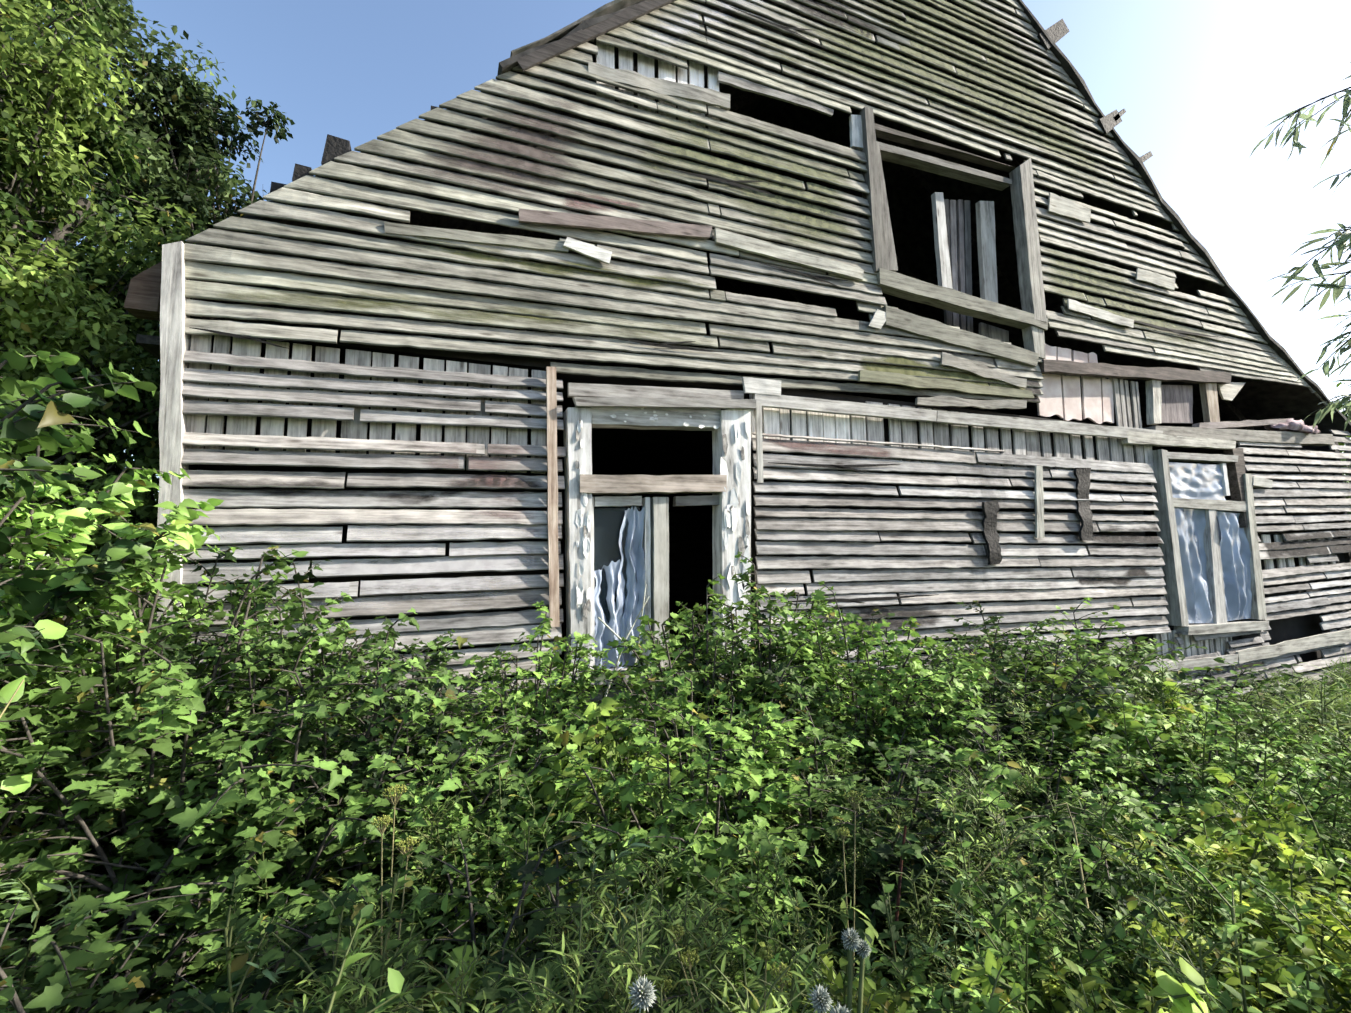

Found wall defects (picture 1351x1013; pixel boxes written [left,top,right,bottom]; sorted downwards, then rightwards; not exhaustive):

water stain [779,0,1099,178]
water stain [651,125,848,243]
water stain [861,356,1041,402]